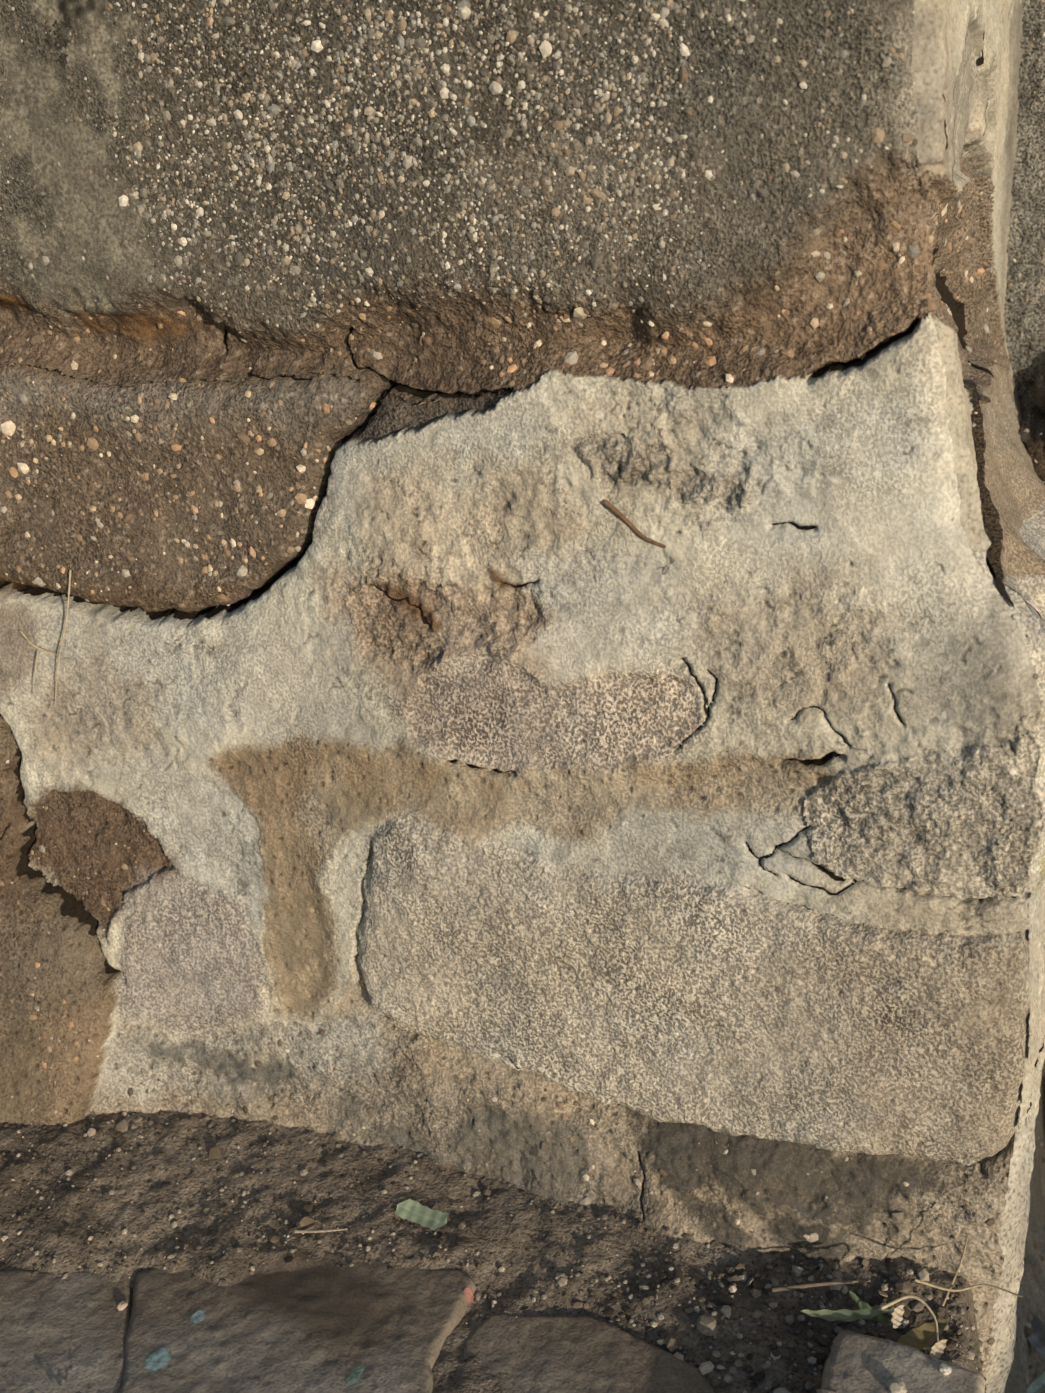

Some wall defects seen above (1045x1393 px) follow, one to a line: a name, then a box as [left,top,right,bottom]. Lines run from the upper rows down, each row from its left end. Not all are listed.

spalling [0,7,1020,606]
spalling [343,573,556,675]
crack [746,825,863,895]